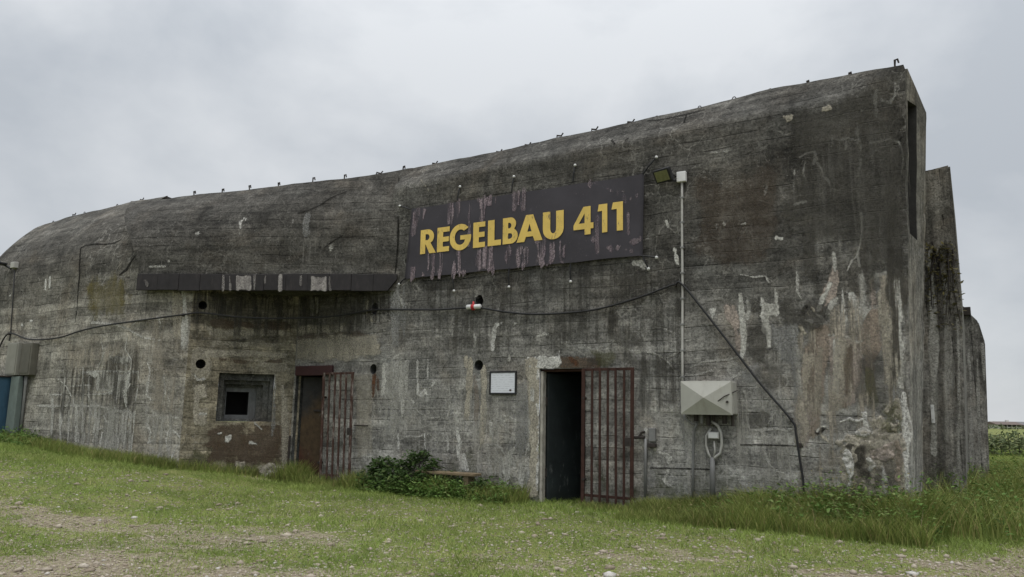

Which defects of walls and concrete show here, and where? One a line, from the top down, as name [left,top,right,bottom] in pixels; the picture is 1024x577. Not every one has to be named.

damp [50,284,437,466]
damp [709,77,913,495]
spalling [815,412,907,496]
damp [928,250,985,469]